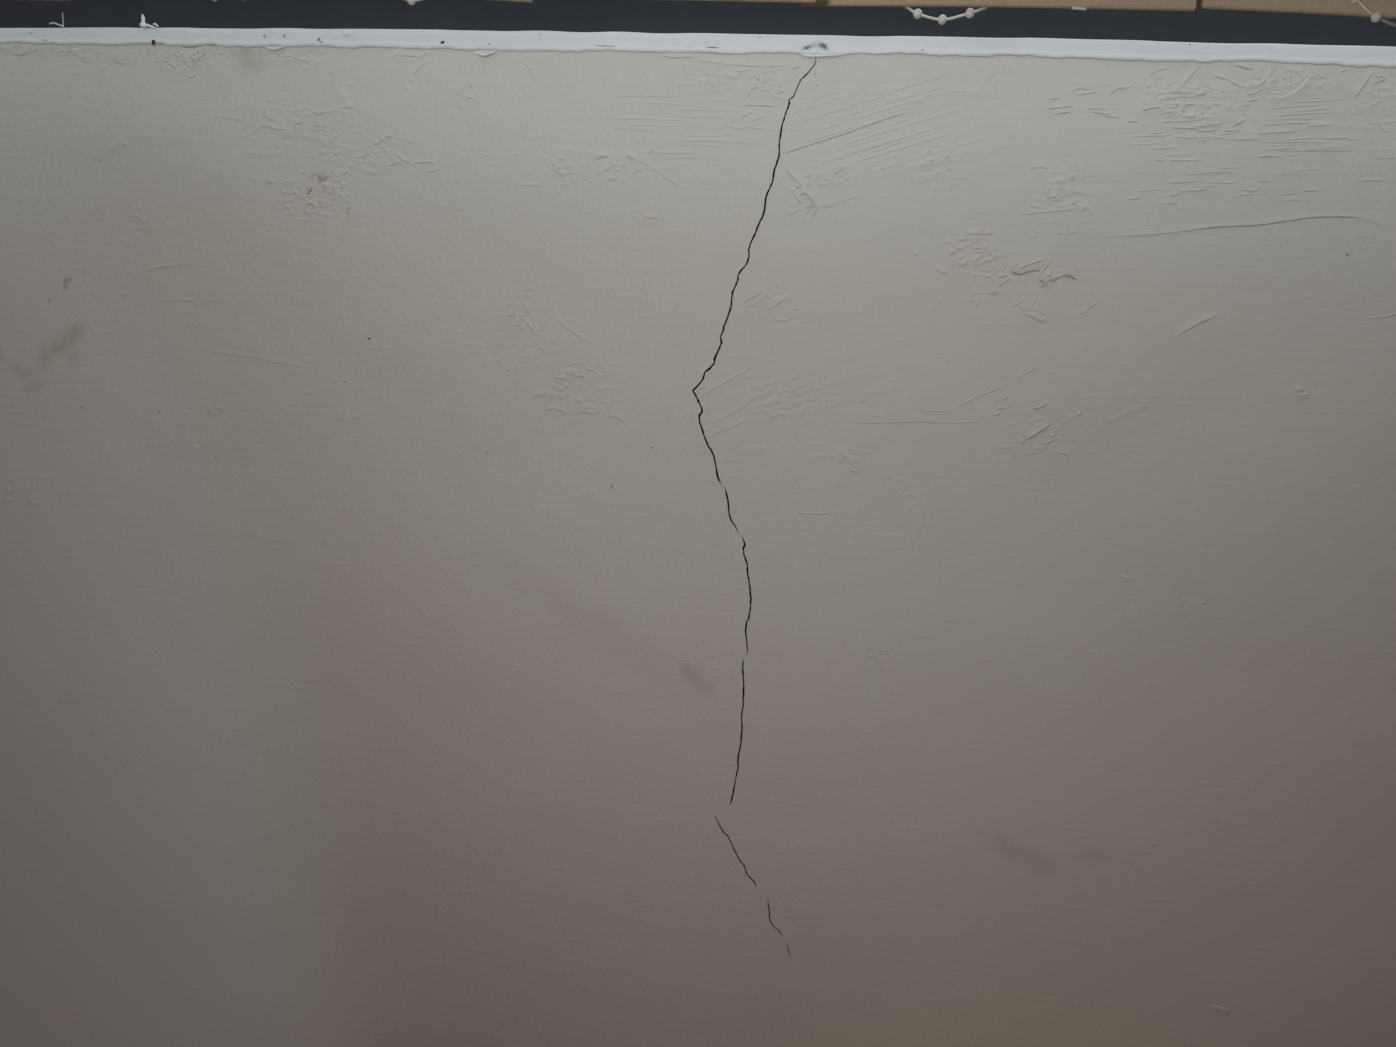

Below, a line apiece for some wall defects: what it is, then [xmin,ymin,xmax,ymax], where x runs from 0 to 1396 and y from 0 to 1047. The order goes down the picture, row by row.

crack [692,58,906,957]